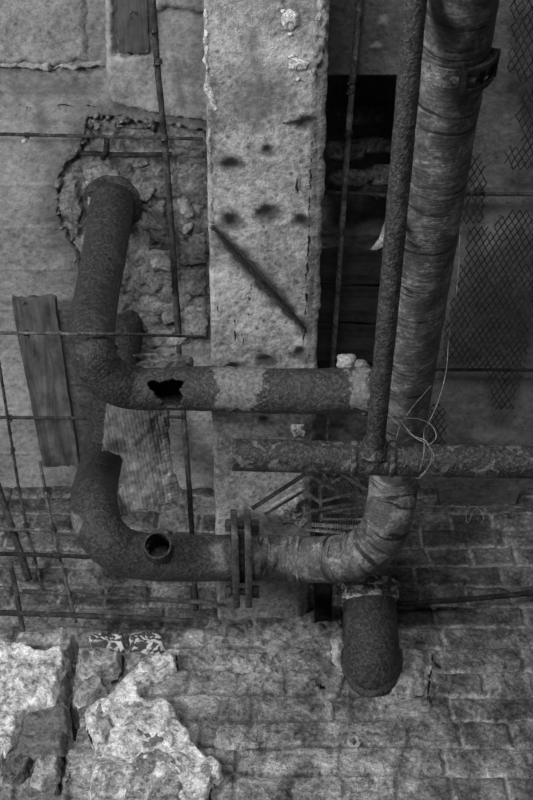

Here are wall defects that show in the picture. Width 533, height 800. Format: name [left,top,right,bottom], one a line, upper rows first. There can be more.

spalling [202,8,218,111]
spalling [53,111,212,349]
peeling [0,640,67,777]
peeling [84,653,223,800]
crack [427,653,441,706]